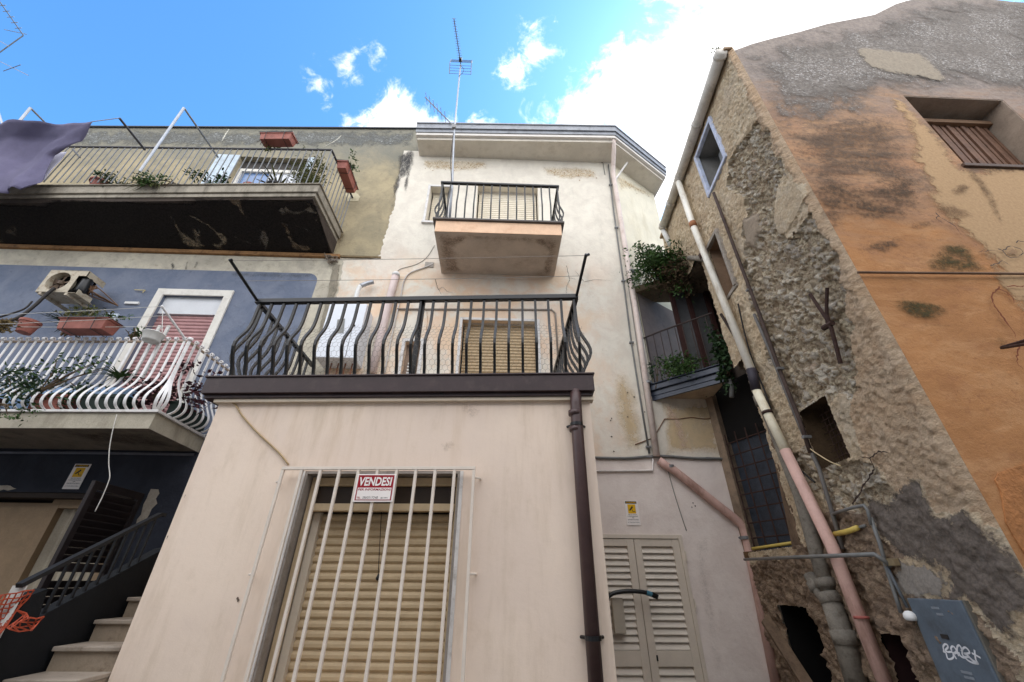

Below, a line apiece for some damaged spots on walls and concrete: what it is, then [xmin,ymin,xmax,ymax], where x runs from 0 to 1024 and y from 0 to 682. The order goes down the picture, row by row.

leakage [802,123,915,217]
leakage [0,198,343,254]
spalling [726,121,858,416]
leakage [899,301,943,317]
leakage [931,245,980,271]
crack [979,240,1024,366]
crack [852,450,888,505]
peeling [994,464,1024,553]